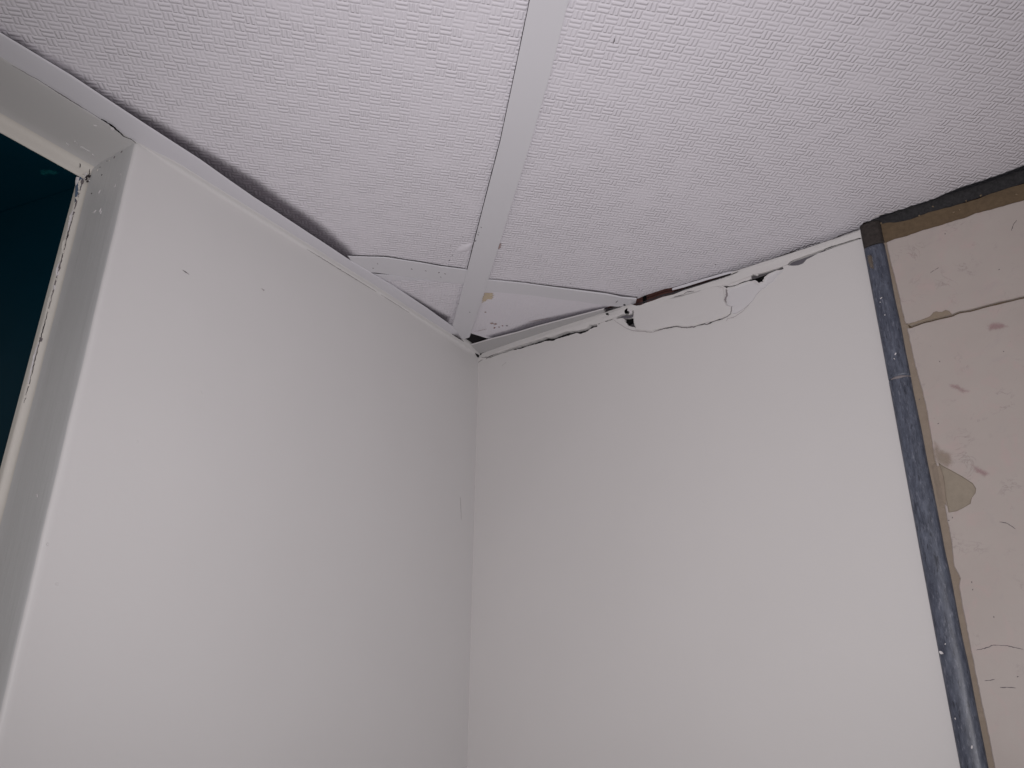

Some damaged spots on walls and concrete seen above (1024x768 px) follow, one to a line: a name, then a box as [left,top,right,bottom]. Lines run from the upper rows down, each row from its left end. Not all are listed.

spalling [938,462,976,521]